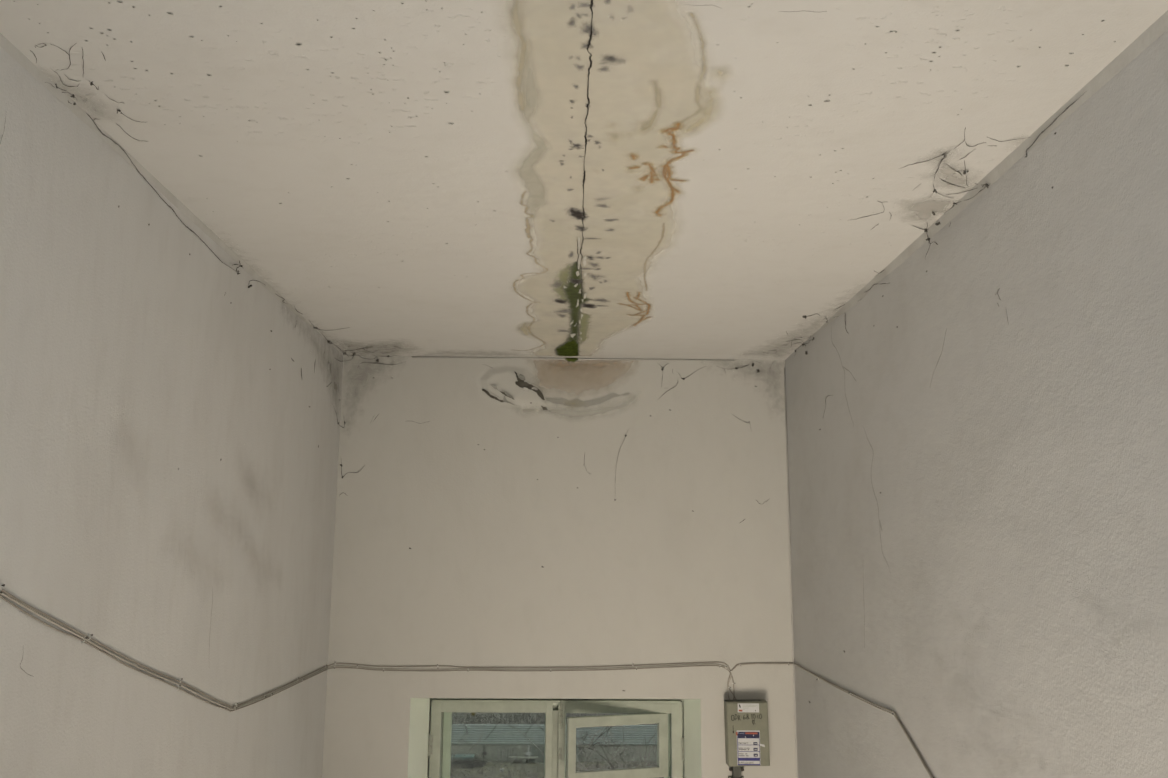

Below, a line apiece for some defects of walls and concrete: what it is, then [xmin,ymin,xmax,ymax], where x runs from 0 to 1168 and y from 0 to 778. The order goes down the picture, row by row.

crack [86,113,237,272]
crack [563,0,594,344]
water stain [513,0,706,415]
corrosion [630,122,693,216]
peeling [482,372,550,412]